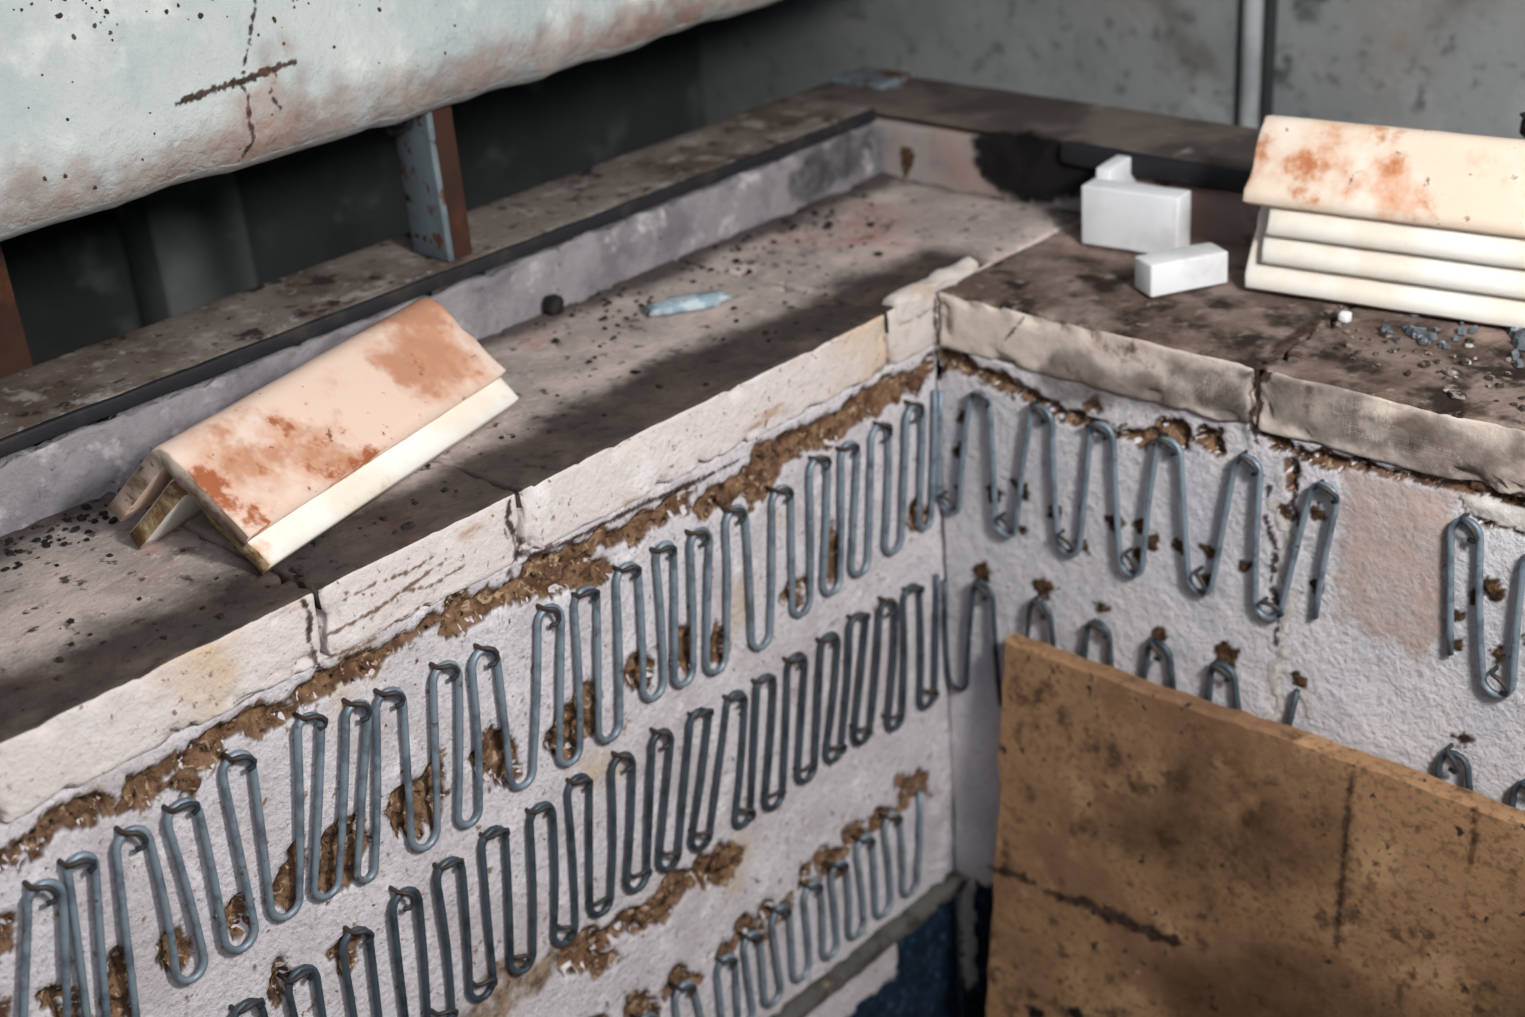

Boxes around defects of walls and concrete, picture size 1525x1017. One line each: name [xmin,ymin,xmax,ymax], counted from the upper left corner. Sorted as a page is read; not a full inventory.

crack [176,0,297,161]
crack [1249,320,1321,722]
spalling [1255,424,1525,534]
spalling [0,347,1227,872]
spalling [0,911,16,955]
spalling [35,983,80,1017]
spalling [100,945,132,1017]
spalling [267,956,295,1009]
spalling [264,748,450,912]
spalling [466,840,744,1017]
spalling [595,767,933,1017]
peeling [850,877,993,1017]